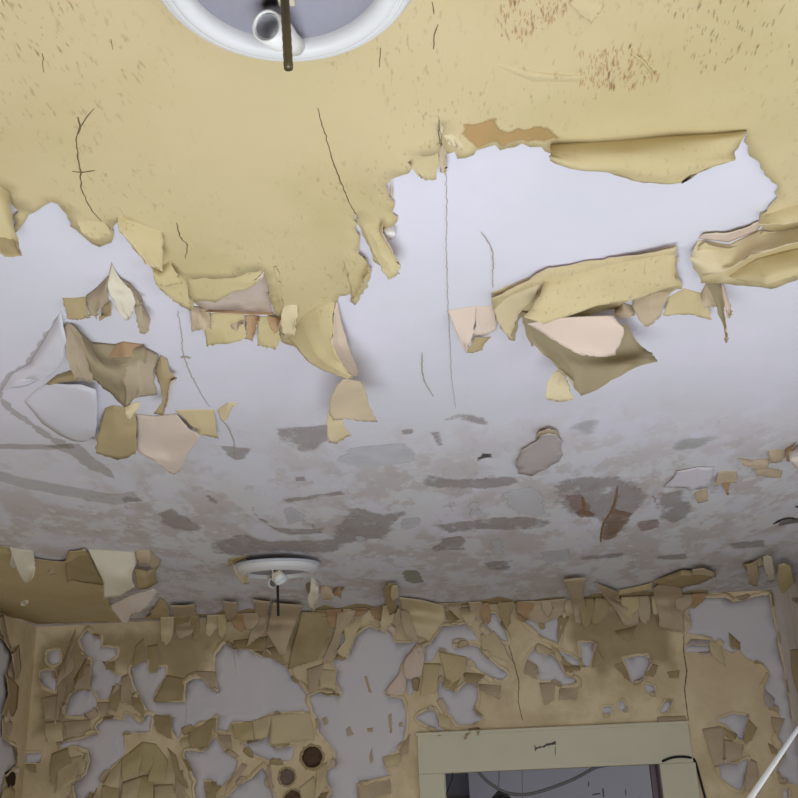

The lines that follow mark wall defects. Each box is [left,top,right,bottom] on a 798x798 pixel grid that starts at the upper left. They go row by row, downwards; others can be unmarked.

crack [72,109,102,221]
crack [317,108,358,218]
peeling [0,0,798,476]
crack [445,176,456,407]
crack [177,312,210,407]
crack [421,355,433,396]
peeling [664,442,798,503]
water stain [403,570,423,583]
peeling [0,545,604,798]
peeling [580,555,798,798]